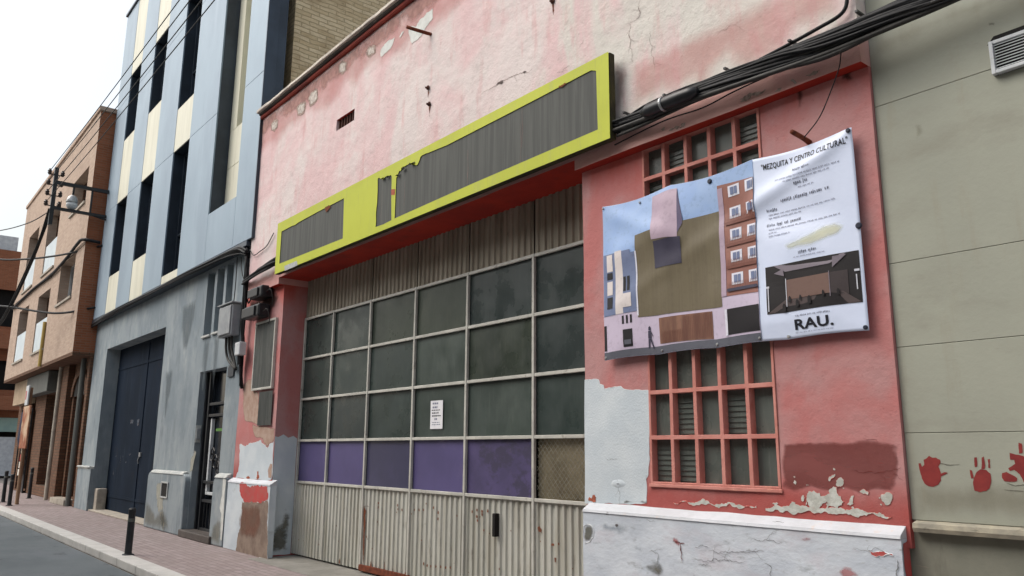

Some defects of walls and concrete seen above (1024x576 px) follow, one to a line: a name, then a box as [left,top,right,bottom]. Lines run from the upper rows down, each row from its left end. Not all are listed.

peeling [366,7,434,57]
peeling [220,379,297,559]
peeling [584,379,650,527]
peeling [673,468,893,519]